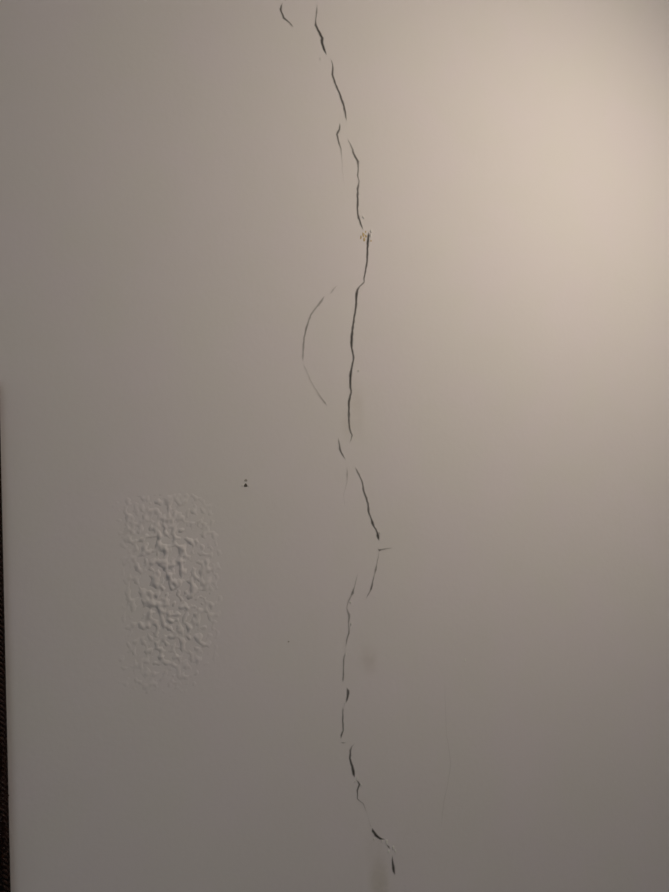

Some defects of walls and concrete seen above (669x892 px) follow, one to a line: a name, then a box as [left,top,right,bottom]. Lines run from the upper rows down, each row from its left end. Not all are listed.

crack [315,23,372,455]
crack [362,483,381,551]
crack [341,732,362,796]
crack [372,829,396,873]